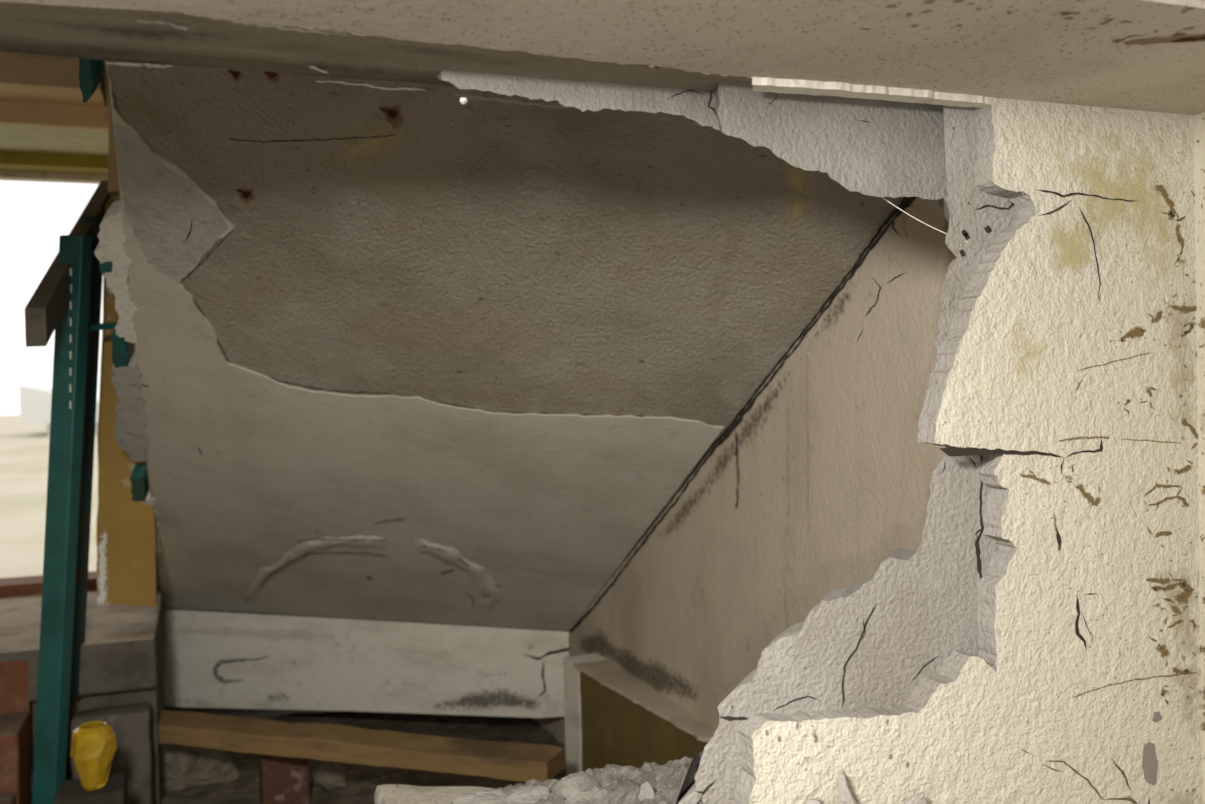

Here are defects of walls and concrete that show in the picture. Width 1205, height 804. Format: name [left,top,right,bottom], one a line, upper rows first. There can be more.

peeling [78,58,171,103]
rust [380,107,402,125]
rust [1117,34,1205,47]
rust [236,189,254,202]
crack [959,190,1138,301]
water stain [1076,172,1205,390]
peeling [94,200,162,591]
crack [524,197,917,697]
crack [940,431,1103,579]
water stain [1059,395,1198,511]
peeling [96,532,109,606]
water stain [1073,535,1205,731]